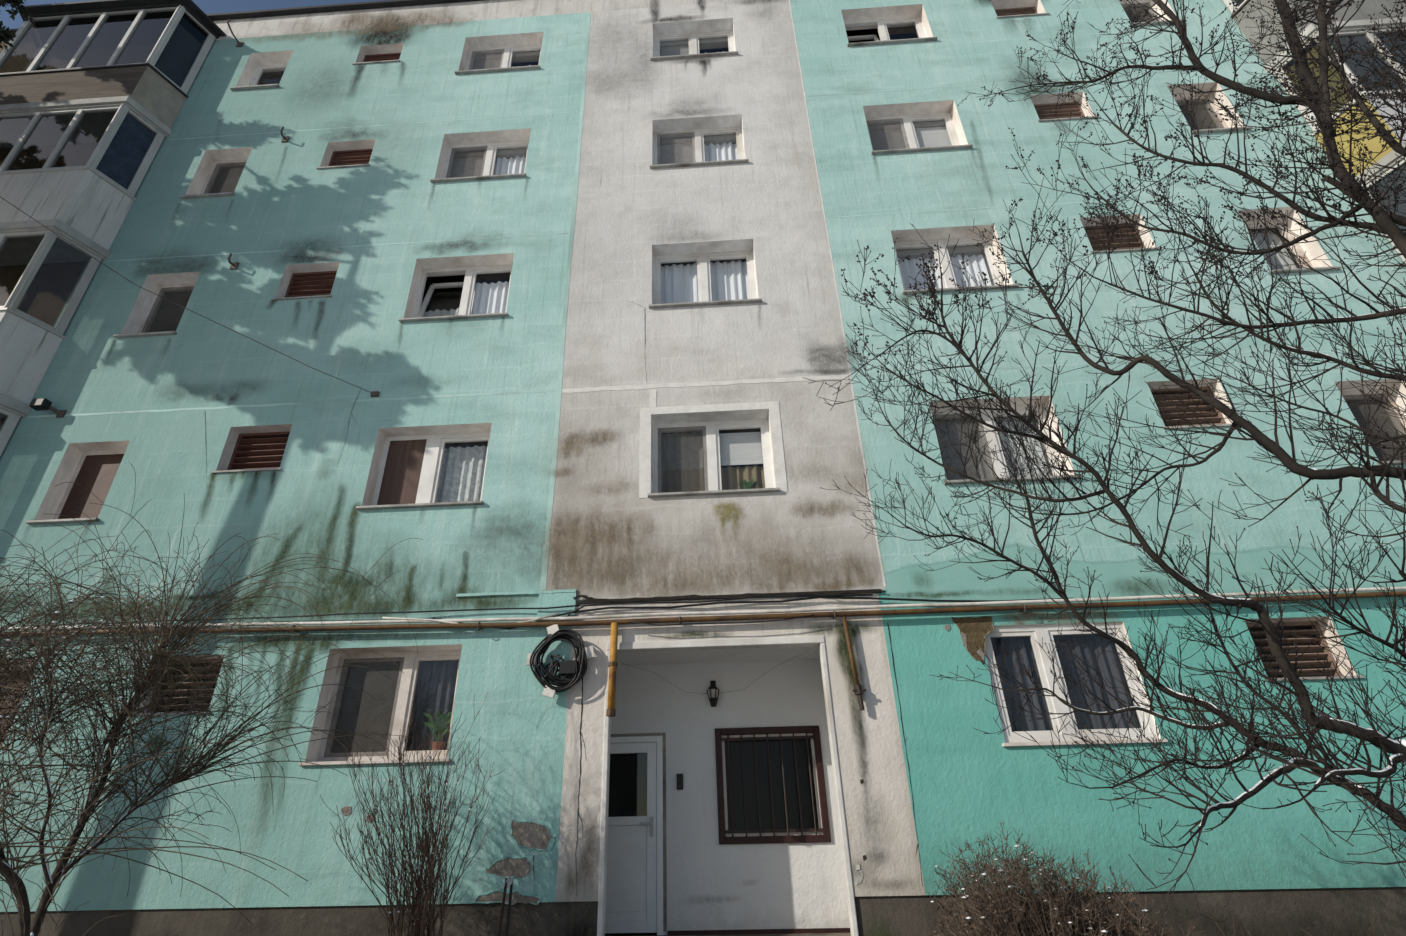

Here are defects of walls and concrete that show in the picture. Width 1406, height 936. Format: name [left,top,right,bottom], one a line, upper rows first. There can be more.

leakage [555,432,612,475]
leakage [322,505,357,576]
leakage [549,516,748,595]
peeling [944,616,994,662]
leakage [264,649,313,719]
spalling [475,818,555,905]